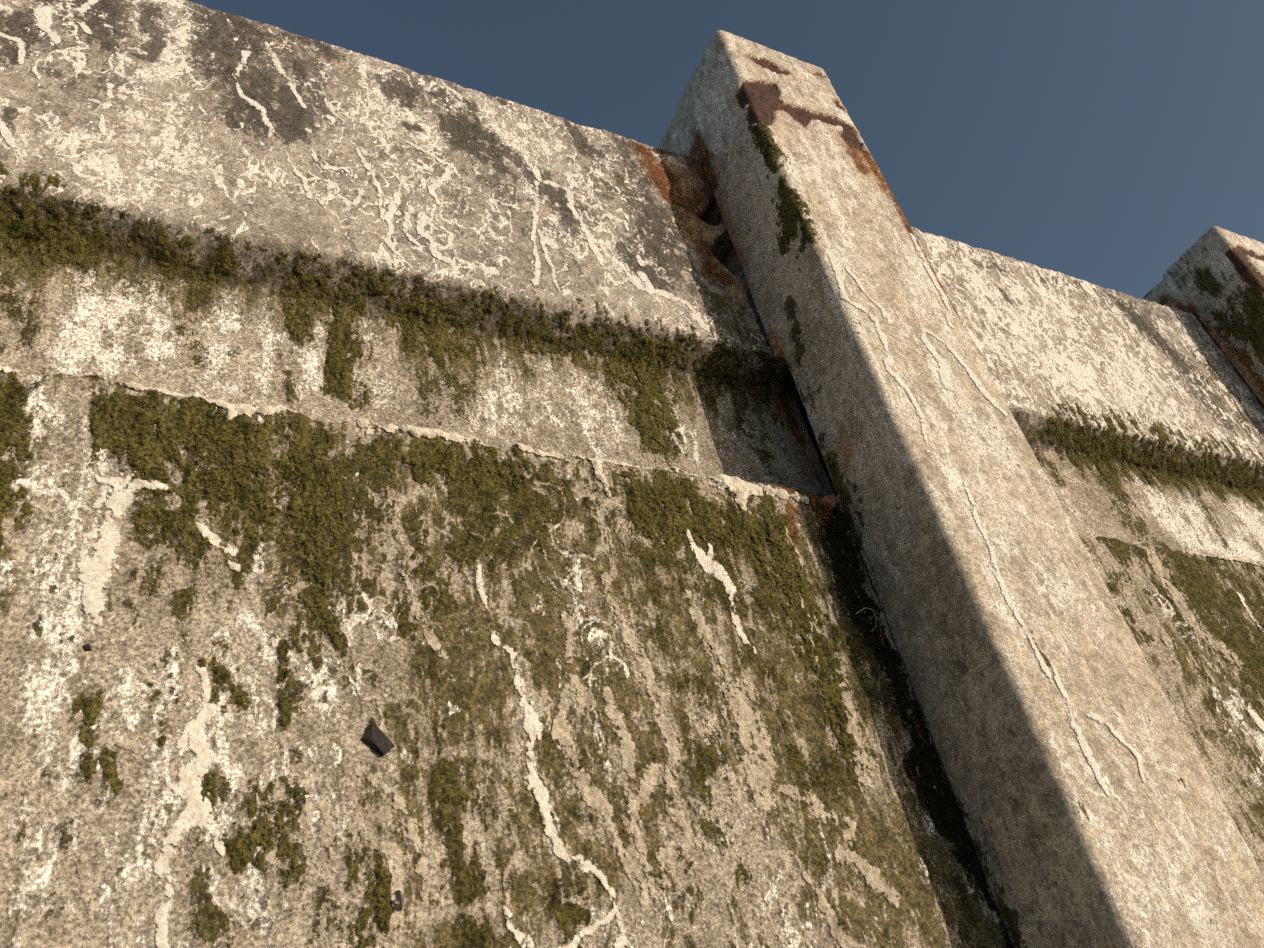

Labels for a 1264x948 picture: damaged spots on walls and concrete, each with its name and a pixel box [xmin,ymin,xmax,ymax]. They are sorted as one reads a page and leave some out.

water stain [0,0,170,70]
water stain [185,5,339,148]
corrosion [632,131,720,221]
corrosion [1159,294,1212,332]
water stain [76,448,169,625]
water stain [195,521,241,571]
water stain [328,418,639,497]
corrosion [769,483,829,536]
water stain [154,665,225,948]
water stain [354,762,432,948]
water stain [491,572,699,948]
water stain [657,466,1013,948]